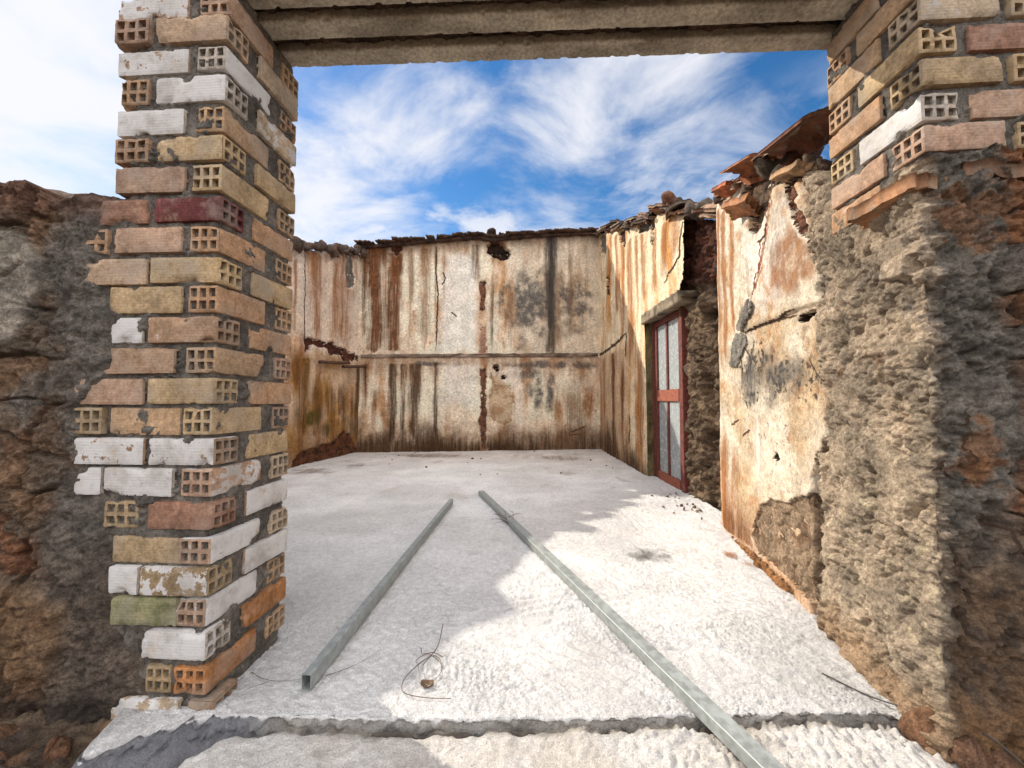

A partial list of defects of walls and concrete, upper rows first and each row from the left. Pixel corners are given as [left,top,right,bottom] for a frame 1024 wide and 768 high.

corrosion [362,248,428,353]
spalling [487,243,511,261]
damp [491,237,595,409]
corrosion [609,222,677,459]
crack [664,221,683,283]
spalling [593,174,817,511]
corrosion [717,210,734,351]
crack [751,181,778,295]
crack [740,308,796,380]
corrosion [771,229,812,291]
peeling [751,492,826,603]